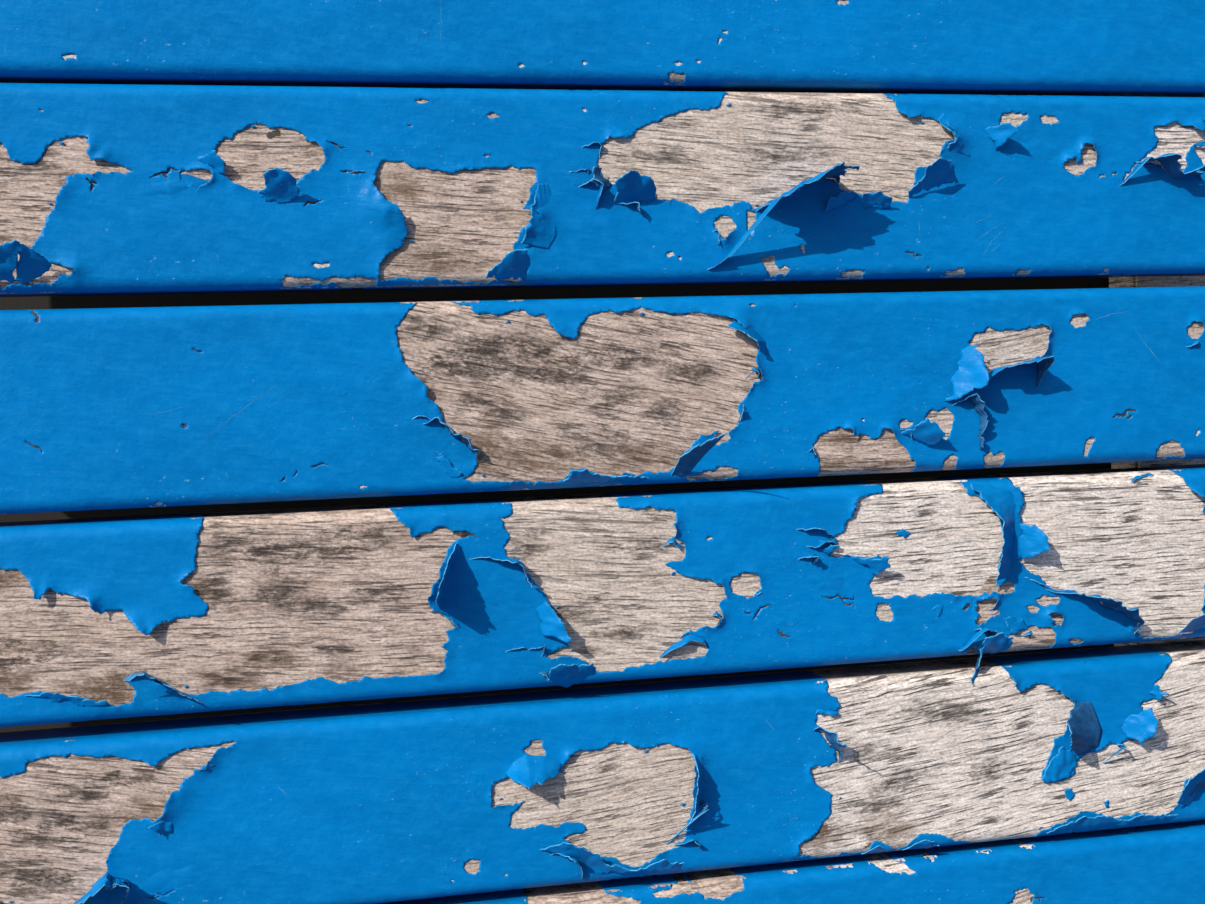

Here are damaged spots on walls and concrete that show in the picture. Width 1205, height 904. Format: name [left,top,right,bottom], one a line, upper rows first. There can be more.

peeling [0,136,132,294]
peeling [180,123,325,203]
peeling [280,154,557,289]
peeling [570,92,970,270]
peeling [760,255,790,281]
peeling [1064,122,1205,187]
peeling [0,297,767,707]
peeling [783,321,1205,875]
peeling [0,740,235,904]
peeling [491,740,746,904]
peeling [1009,888,1034,904]